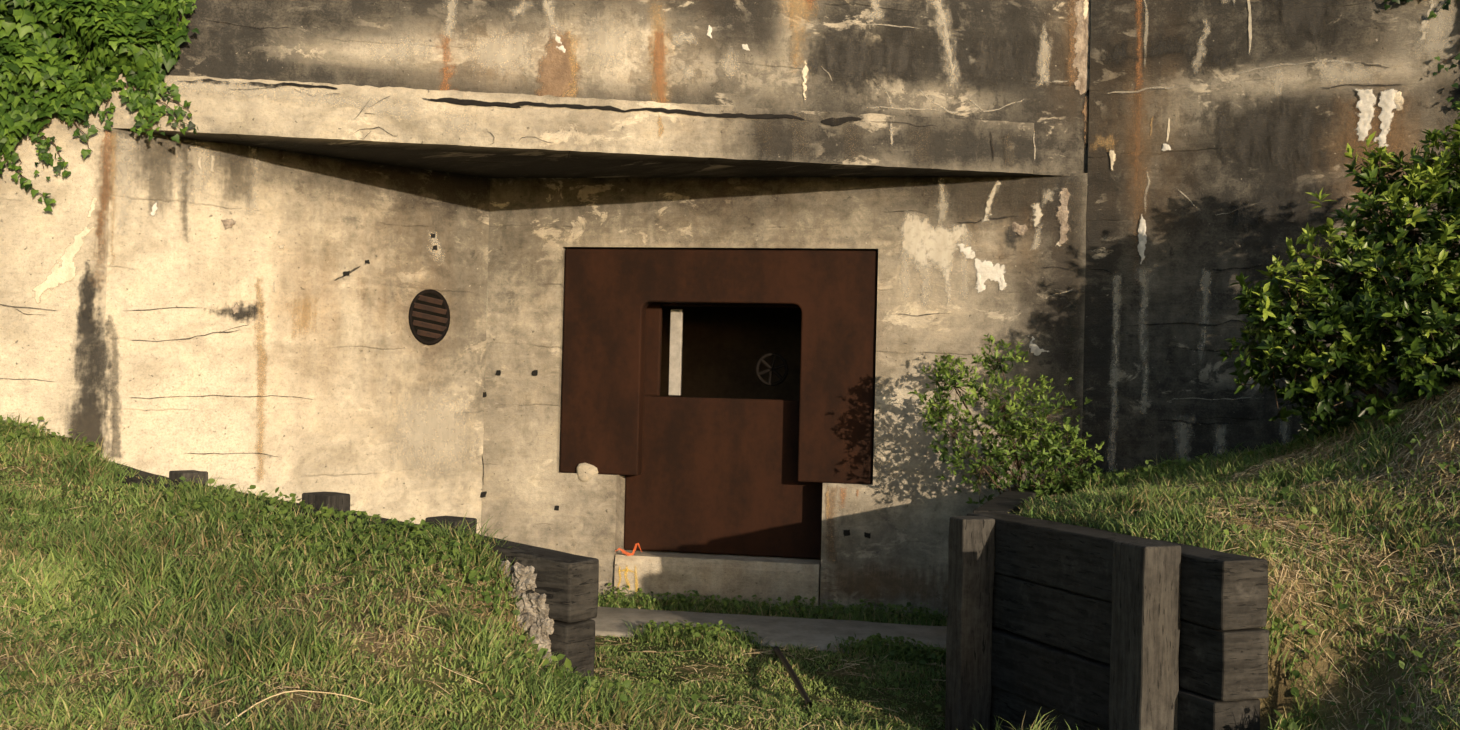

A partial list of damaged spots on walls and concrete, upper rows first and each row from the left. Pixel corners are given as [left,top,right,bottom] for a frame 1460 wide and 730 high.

crack [178,78,393,139]
corrosion [440,0,456,91]
corrosion [654,32,665,103]
crack [424,0,1022,161]
corrosion [1130,0,1148,220]
damp [1101,0,1404,192]
peeling [32,197,99,303]
corrosion [96,131,111,254]
peeling [957,243,1007,293]
damp [1228,185,1332,233]
damp [72,262,112,451]